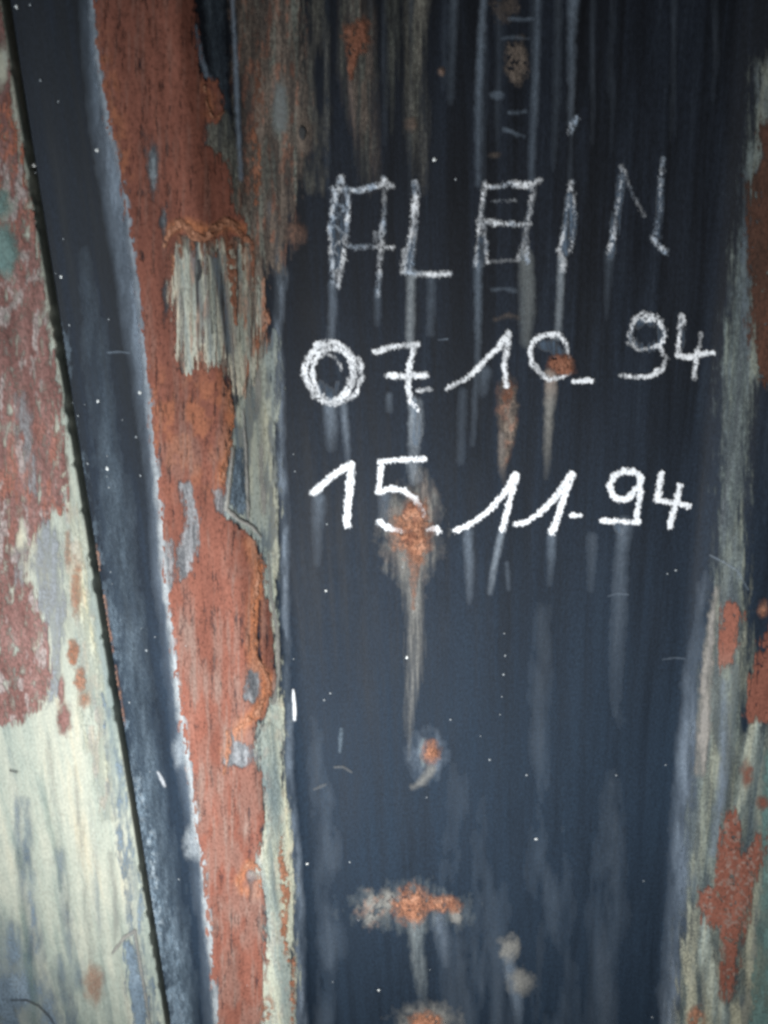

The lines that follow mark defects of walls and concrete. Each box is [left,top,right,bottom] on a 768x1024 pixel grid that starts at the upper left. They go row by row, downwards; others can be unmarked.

peeling [146,142,157,195]
rust [0,60,116,819]
rust [545,355,573,433]
rust [93,0,311,1024]
peeling [163,208,301,1024]
rust [389,485,432,689]
rust [718,601,746,669]
rust [746,633,768,724]
rust [422,741,437,781]
rust [364,890,460,948]
rust [696,808,768,1003]